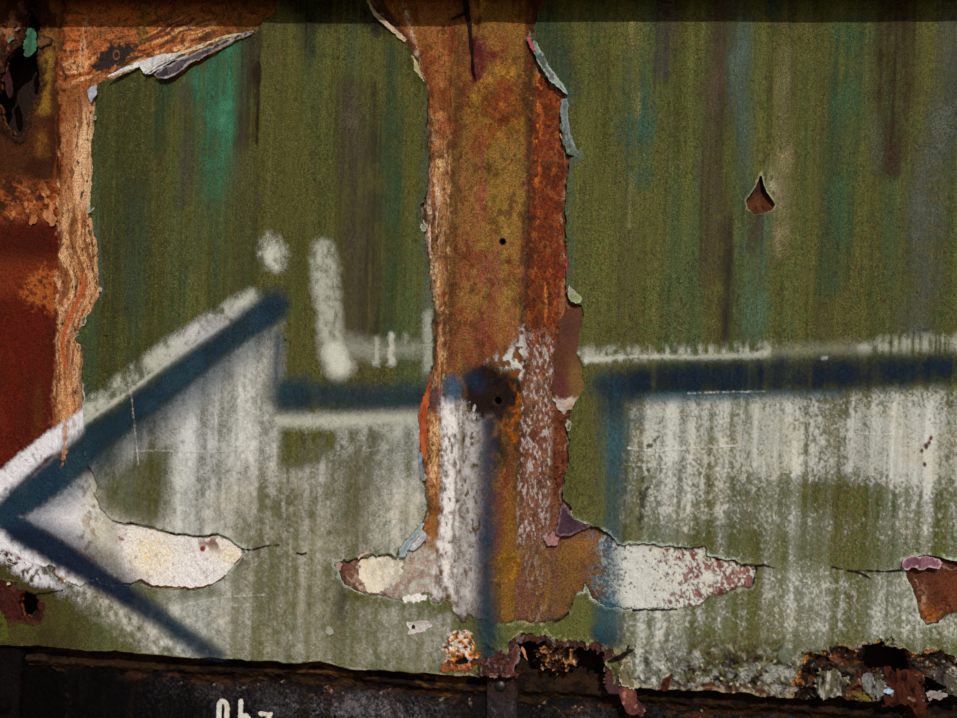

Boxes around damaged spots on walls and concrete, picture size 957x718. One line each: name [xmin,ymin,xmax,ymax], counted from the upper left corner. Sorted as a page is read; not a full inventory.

peeling [0,0,277,485]
peeling [334,0,758,624]
corrosion [467,365,521,453]
peeling [0,549,70,583]
peeling [72,470,245,590]
peeling [489,644,528,679]
peeling [605,659,646,715]